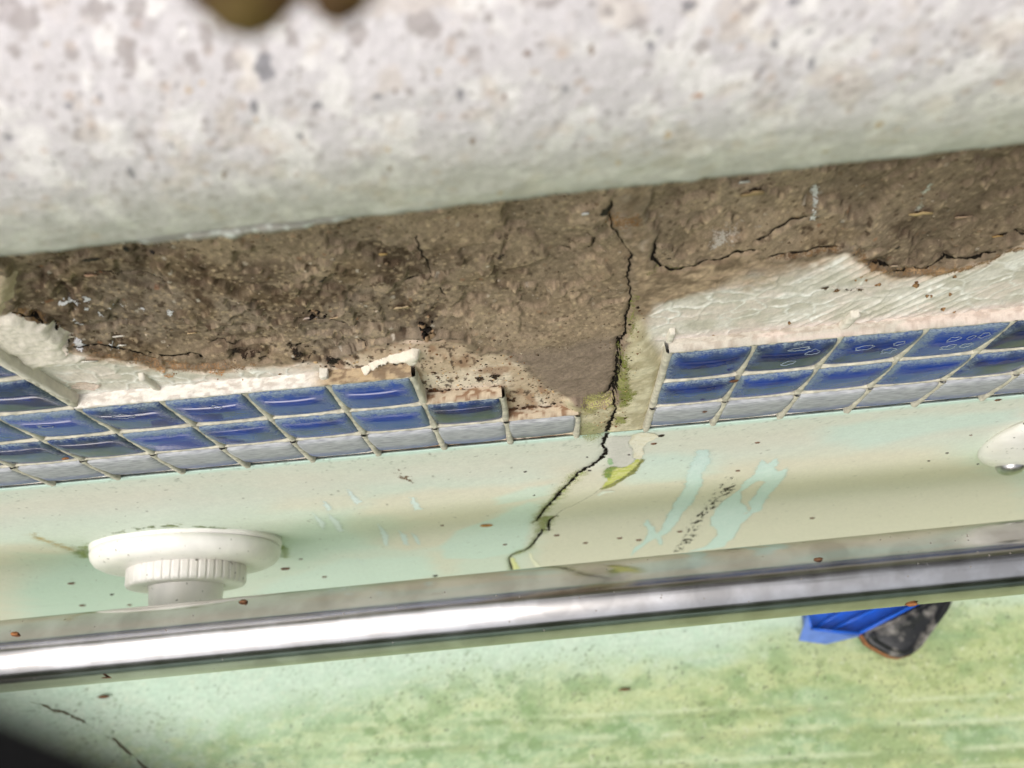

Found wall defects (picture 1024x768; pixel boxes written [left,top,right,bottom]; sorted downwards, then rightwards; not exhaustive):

crack [11,311,239,358]
spalling [0,143,1024,410]
crack [508,200,838,570]
crack [872,229,1024,272]